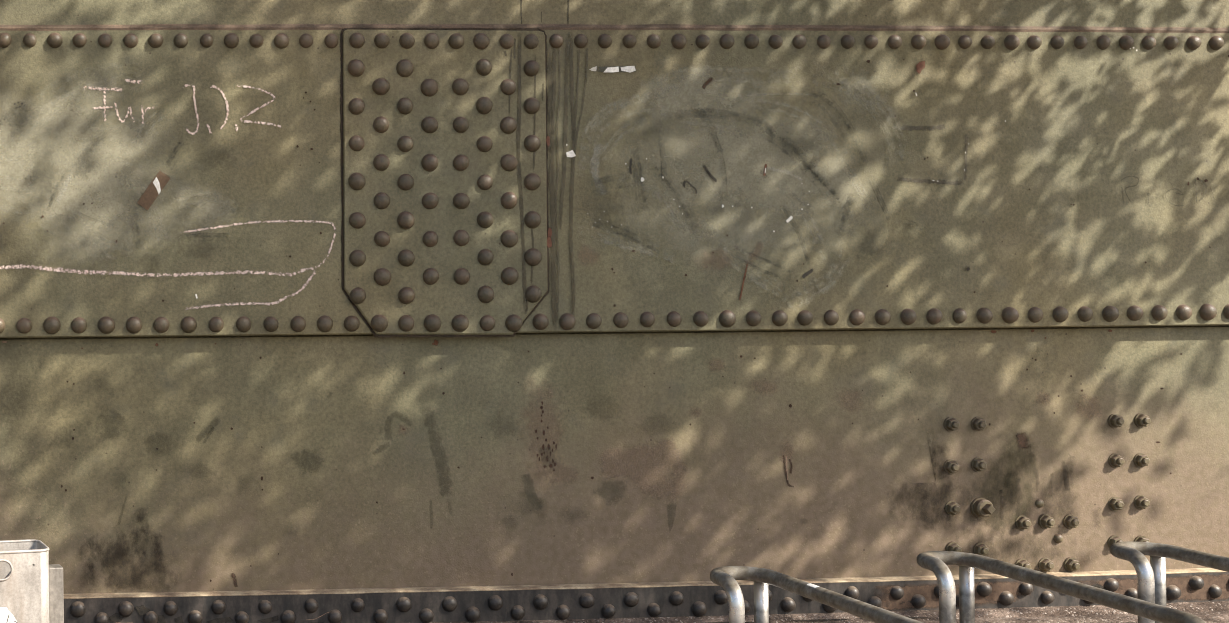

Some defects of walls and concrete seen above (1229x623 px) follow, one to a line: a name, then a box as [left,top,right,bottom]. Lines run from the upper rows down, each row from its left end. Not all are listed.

damp [504,39,588,322]
damp [982,433,1034,522]
damp [89,544,165,587]